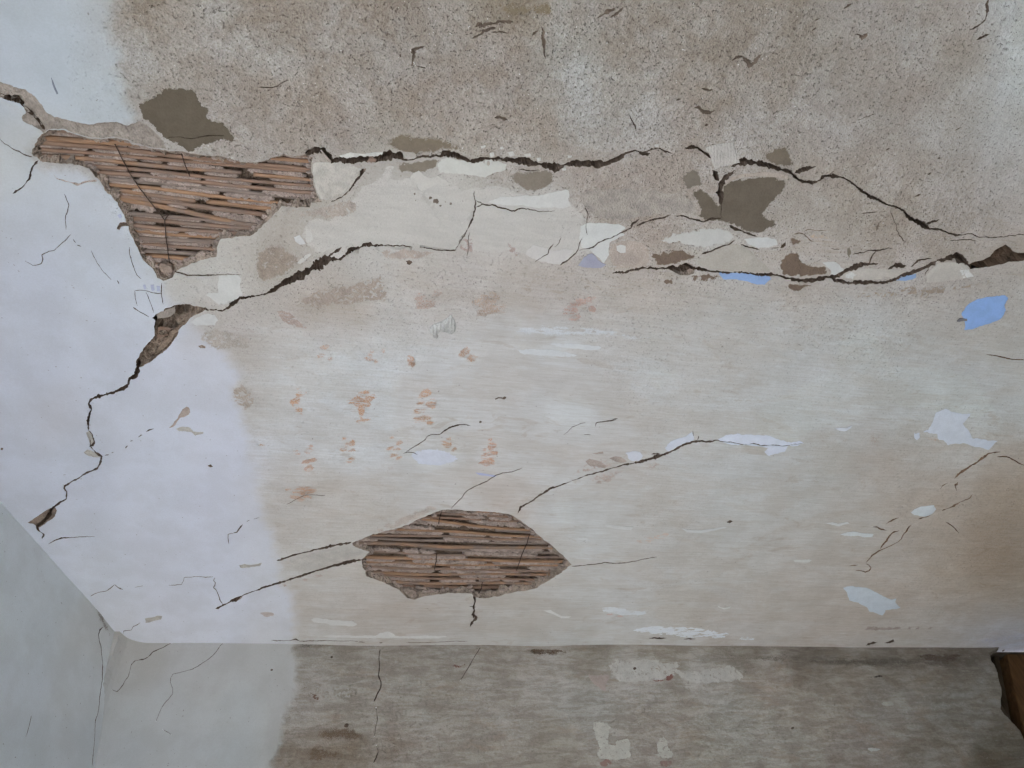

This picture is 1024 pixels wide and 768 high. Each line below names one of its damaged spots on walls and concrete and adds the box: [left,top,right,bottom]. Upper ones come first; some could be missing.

peeling [0,82,357,281]
crack [305,113,1024,285]
crack [177,542,361,609]
spalling [289,512,572,600]
crack [518,436,802,513]
peeling [844,586,932,631]
crack [851,452,1023,573]
crack [273,639,382,763]